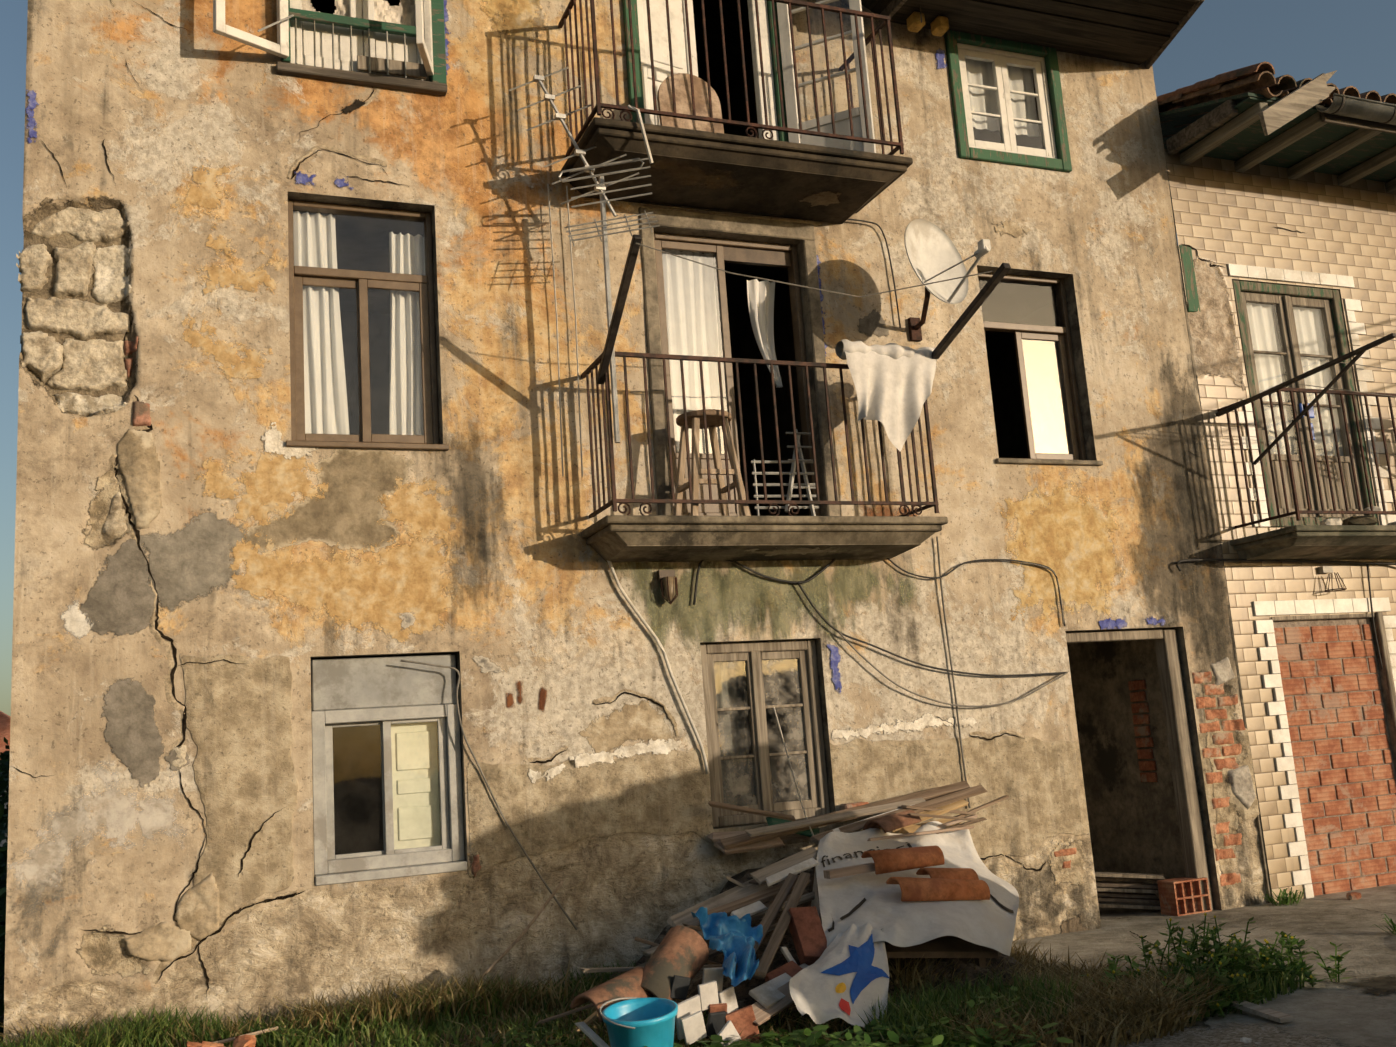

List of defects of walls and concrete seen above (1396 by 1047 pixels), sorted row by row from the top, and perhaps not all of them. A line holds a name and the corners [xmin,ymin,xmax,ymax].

crack [110,0,185,29]
crack [286,86,408,186]
spalling [16,195,151,426]
crack [109,318,305,999]
peeling [528,700,681,783]
peeling [831,713,977,740]
spalling [1192,657,1256,889]
crack [81,928,142,936]